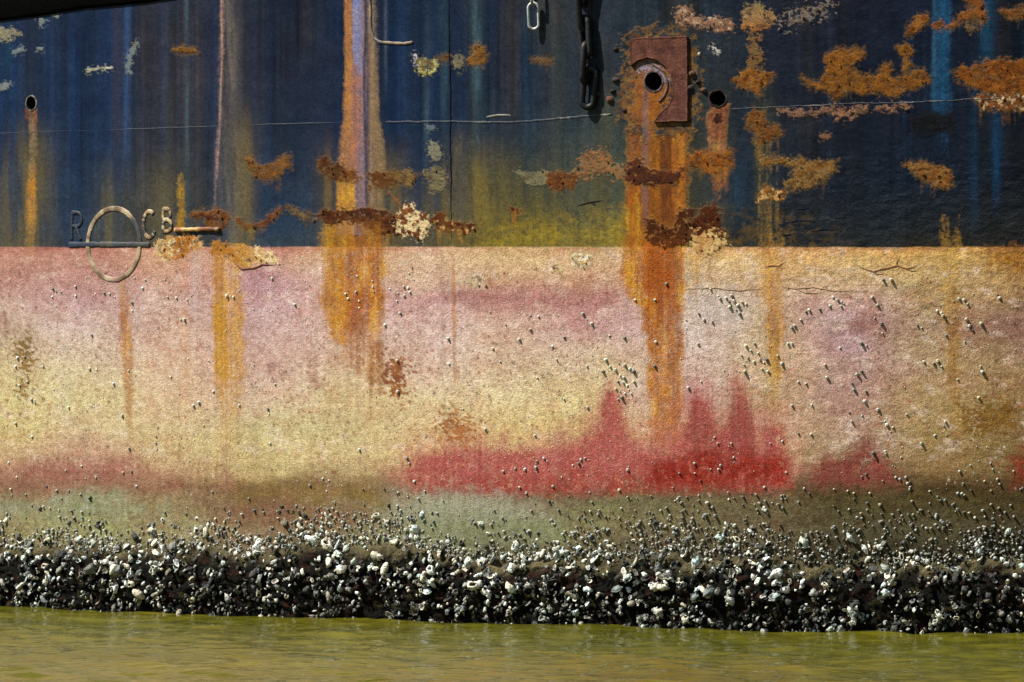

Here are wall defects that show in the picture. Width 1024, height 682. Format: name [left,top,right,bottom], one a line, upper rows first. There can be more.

rust [797,0,1024,109]
rust [948,54,1024,129]
rust [23,107,39,263]
peeling [150,231,283,272]
rust [169,0,424,465]
peeling [389,199,434,246]
rust [610,19,841,425]
rust [899,156,958,199]